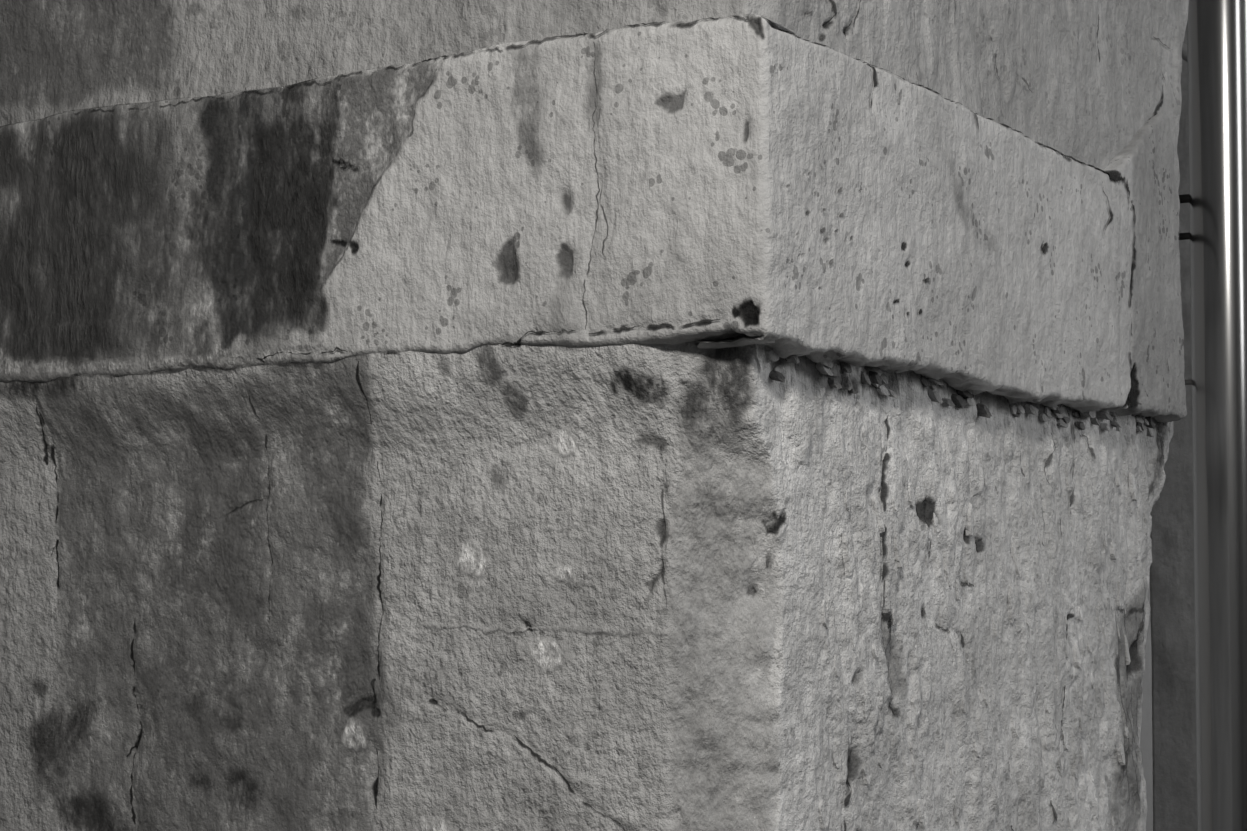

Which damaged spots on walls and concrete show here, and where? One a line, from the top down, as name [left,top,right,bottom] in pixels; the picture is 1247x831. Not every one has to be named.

damp [0,79,338,396]
crack [237,347,400,423]
crack [74,0,1136,399]
crack [429,698,626,831]